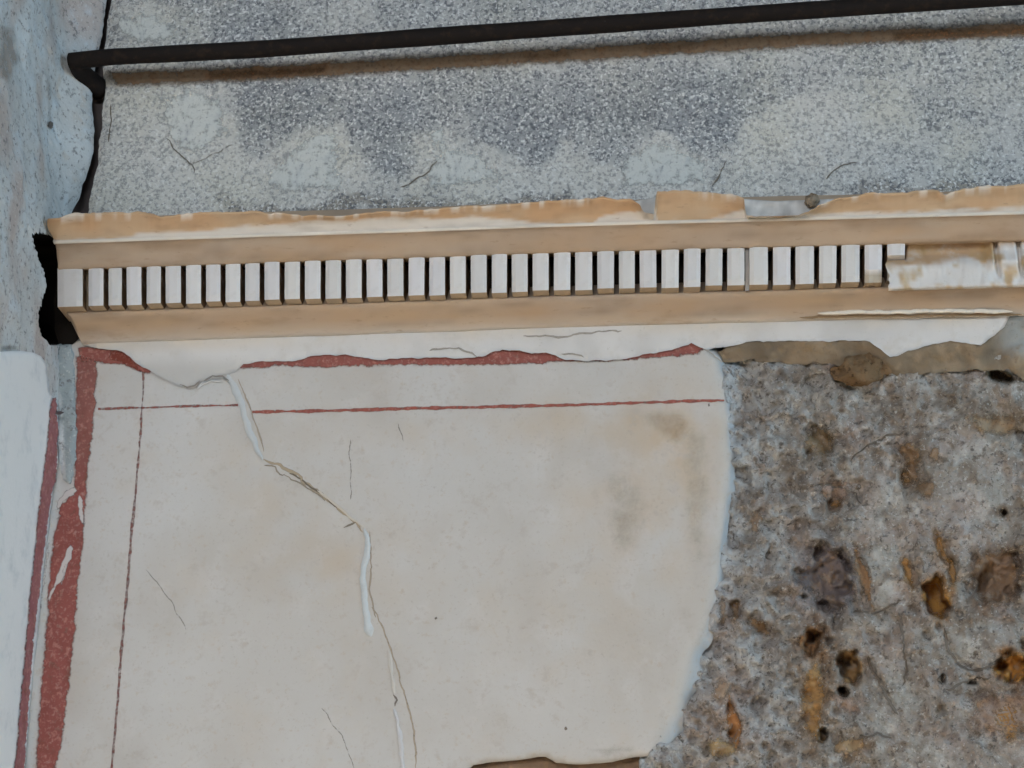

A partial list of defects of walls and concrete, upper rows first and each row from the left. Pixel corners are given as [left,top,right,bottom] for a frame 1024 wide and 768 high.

crack [168,139,231,173]
spalling [885,241,1024,291]
crack [226,374,417,768]
spalling [471,316,1024,768]